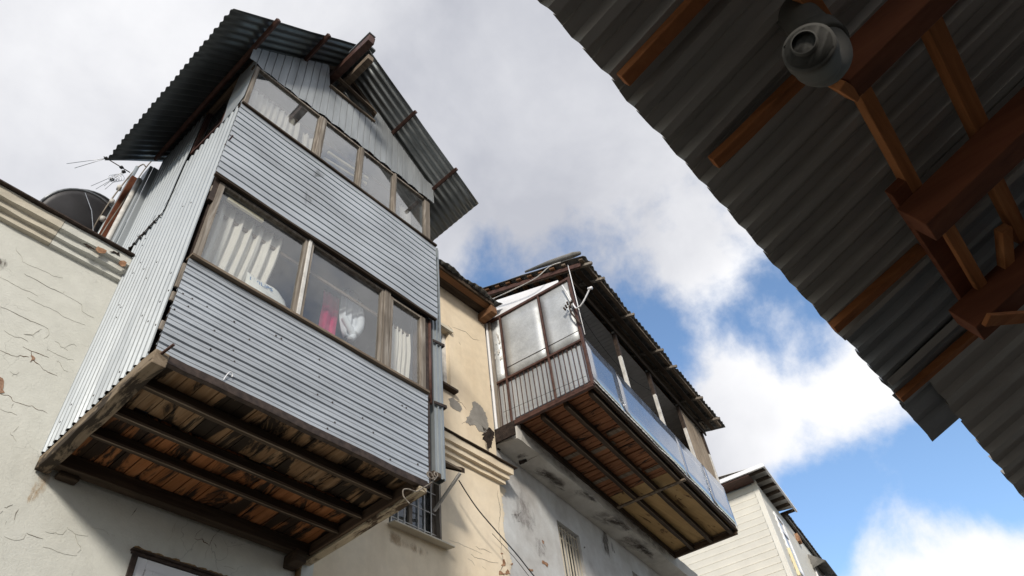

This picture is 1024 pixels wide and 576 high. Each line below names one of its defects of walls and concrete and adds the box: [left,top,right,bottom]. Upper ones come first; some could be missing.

flaking render [83,243,127,267]
crack [2,250,89,439]
peeling [449,397,501,451]
crack [4,505,109,556]